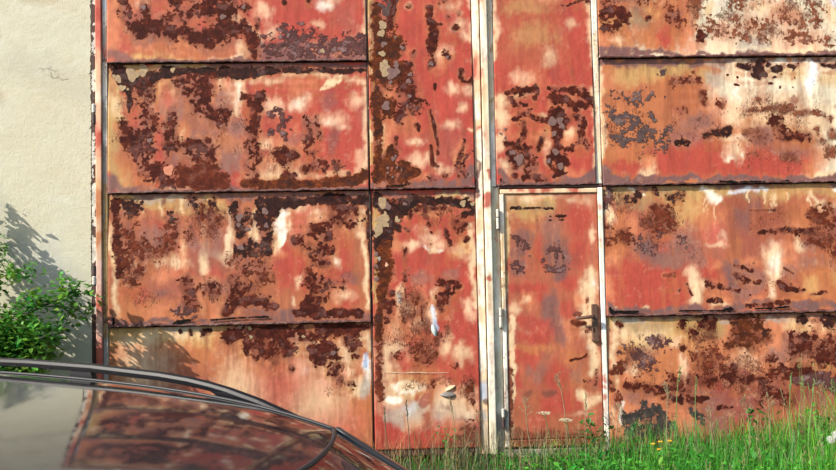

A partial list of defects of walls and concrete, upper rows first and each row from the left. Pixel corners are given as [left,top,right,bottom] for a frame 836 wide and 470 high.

rust [598,0,632,34]
rust [636,0,835,48]
rust [736,58,799,80]
rust [499,68,727,182]
rust [702,95,836,165]
rust [108,0,475,402]
rust [603,186,687,257]
rust [608,263,836,445]
rust [465,379,476,406]